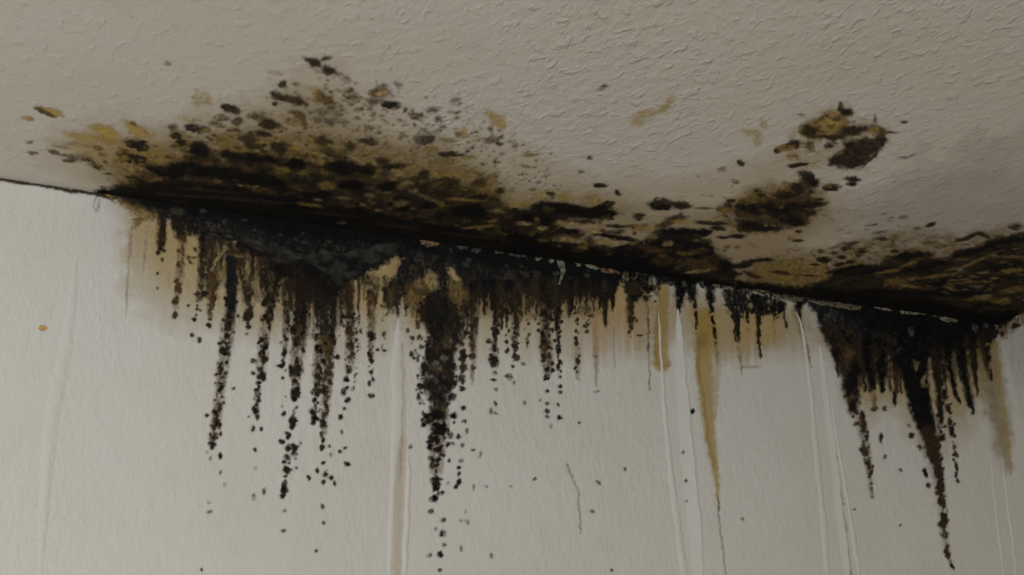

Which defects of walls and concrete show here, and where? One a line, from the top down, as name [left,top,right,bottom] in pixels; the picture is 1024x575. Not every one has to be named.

leakage [305,57,348,80]
leakage [23,107,63,121]
leakage [49,81,1024,539]